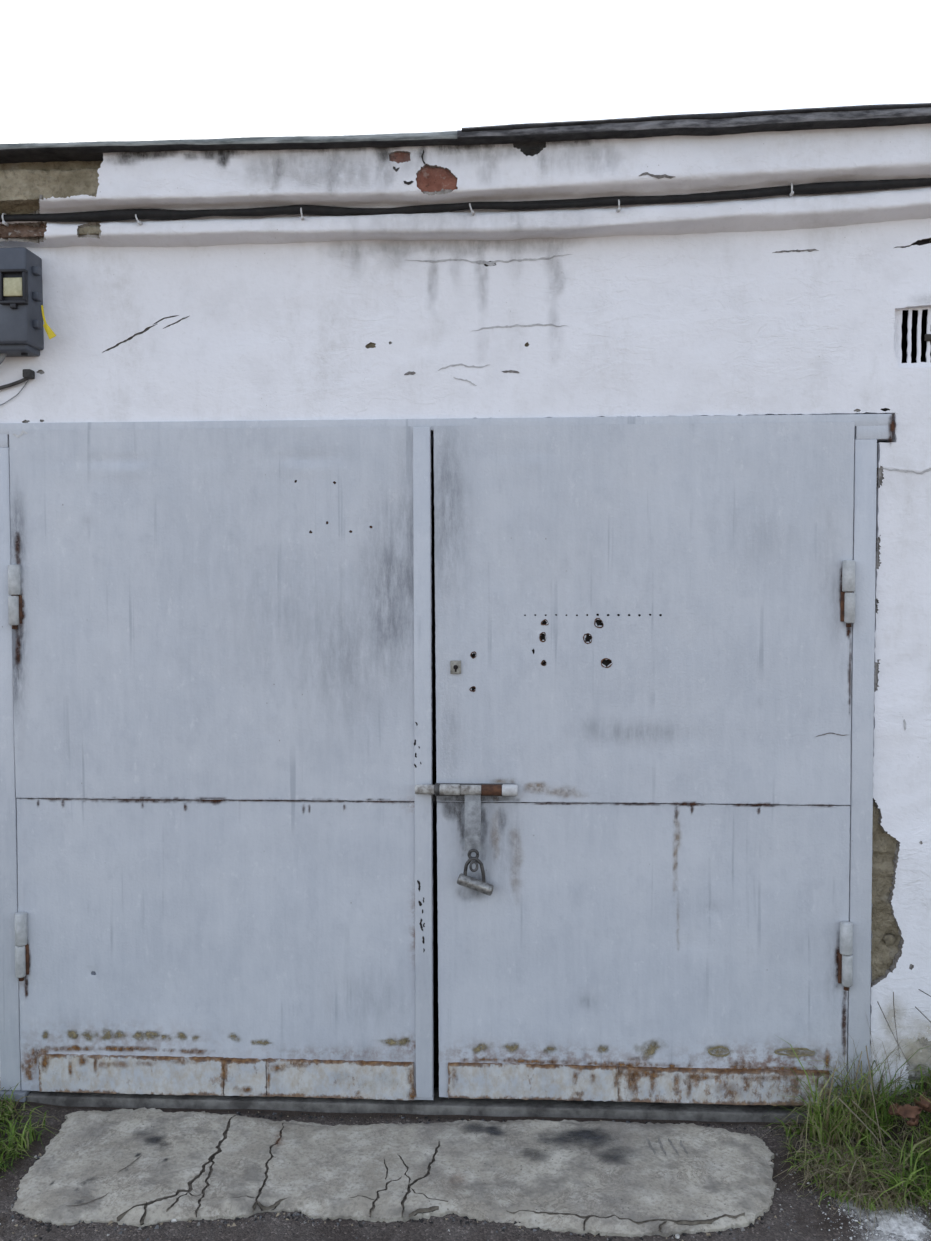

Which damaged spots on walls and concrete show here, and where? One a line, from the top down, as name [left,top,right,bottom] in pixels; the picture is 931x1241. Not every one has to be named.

spalling [388,151,458,195]
spalling [0,161,103,244]
crack [894,238,931,248]
crack [102,315,189,353]
rust [111,797,225,810]
rust [240,799,409,812]
spalling [871,798,914,987]
rust [22,1031,203,1080]
rust [464,1044,556,1064]
rust [588,1042,707,1094]
crack [117,1115,287,1226]
crack [349,1141,448,1217]